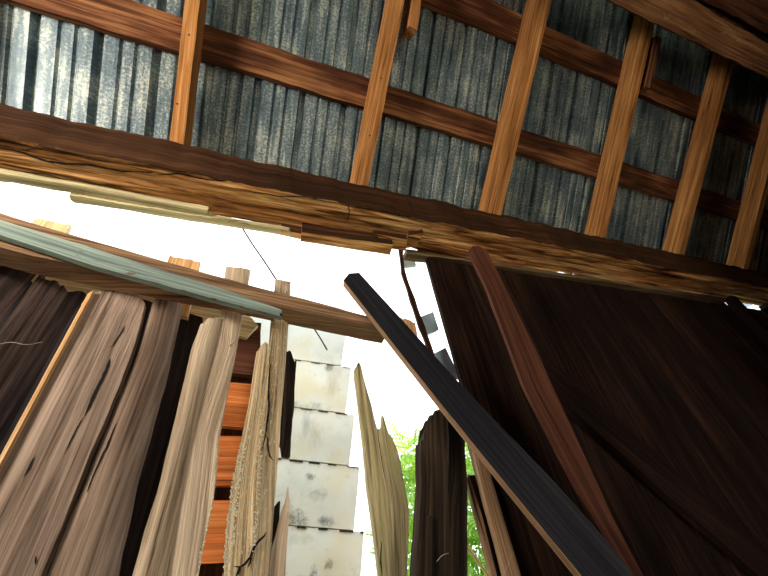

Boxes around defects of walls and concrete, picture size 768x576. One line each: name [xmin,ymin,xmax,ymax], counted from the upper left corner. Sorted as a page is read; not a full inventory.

crack [260,356,274,461]
crack [234,532,266,576]